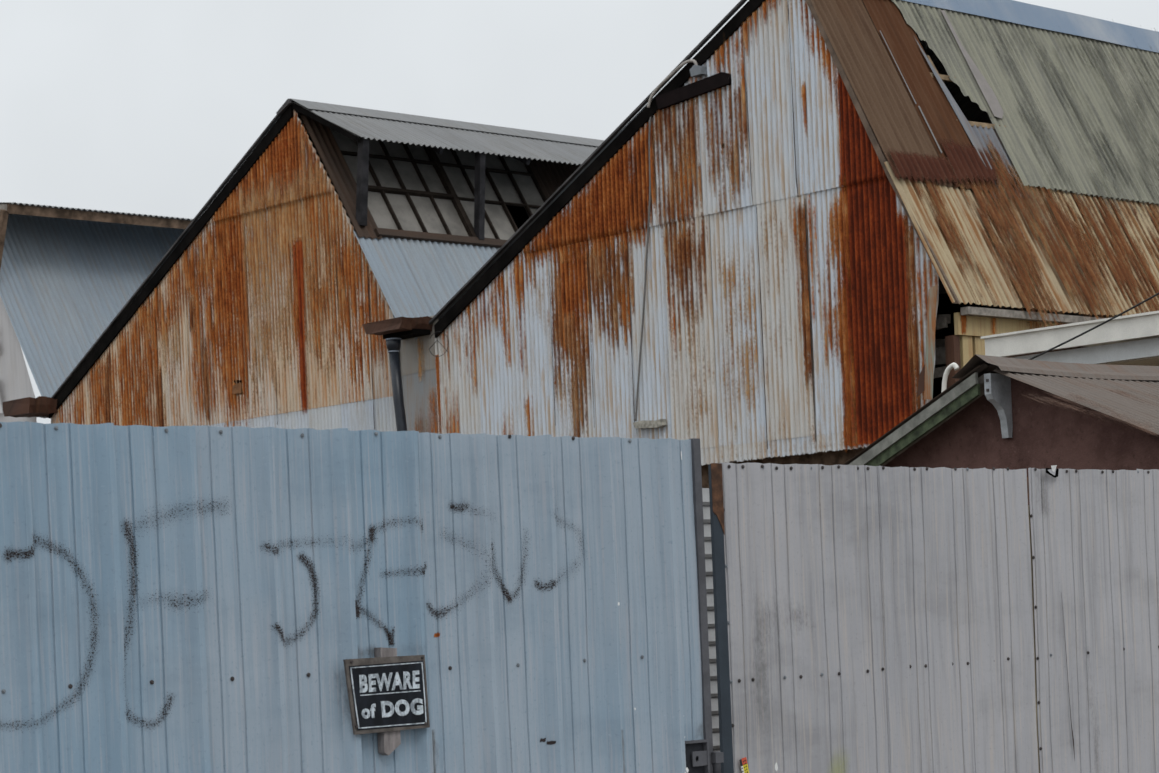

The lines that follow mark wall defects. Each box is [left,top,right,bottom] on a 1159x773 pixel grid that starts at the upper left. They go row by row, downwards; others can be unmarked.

corrosion [58,113,386,427]
corrosion [415,0,781,438]
corrosion [765,0,1159,451]